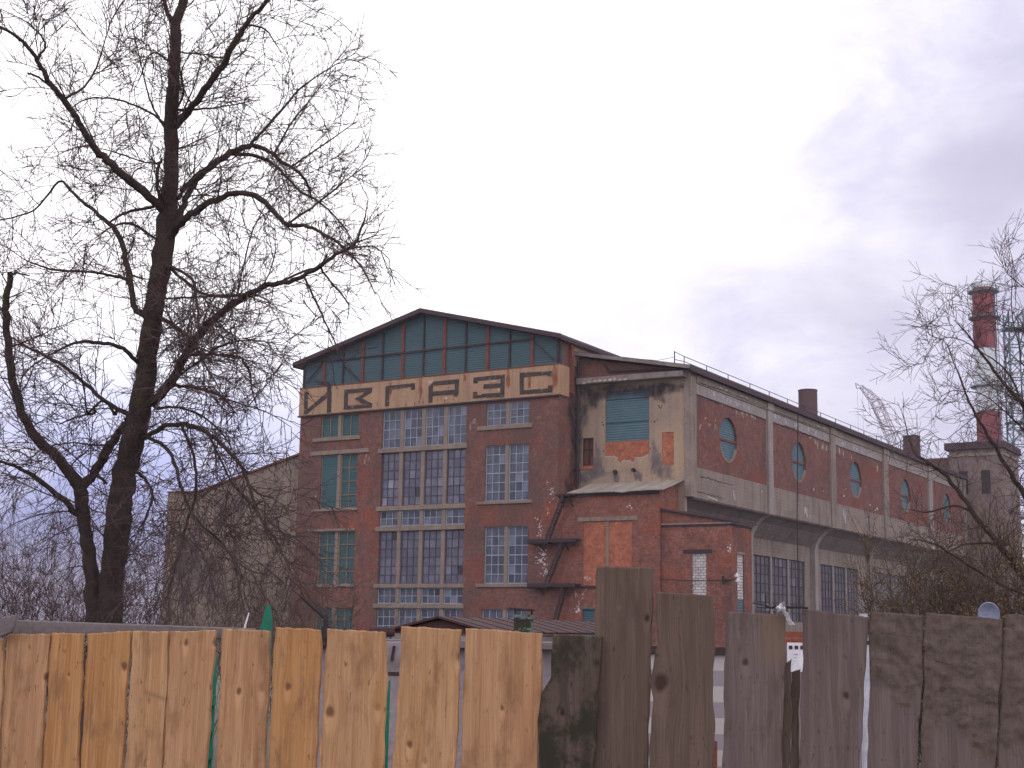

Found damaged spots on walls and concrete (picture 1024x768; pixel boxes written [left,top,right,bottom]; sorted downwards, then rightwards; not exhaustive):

spalling [603,448,651,472]